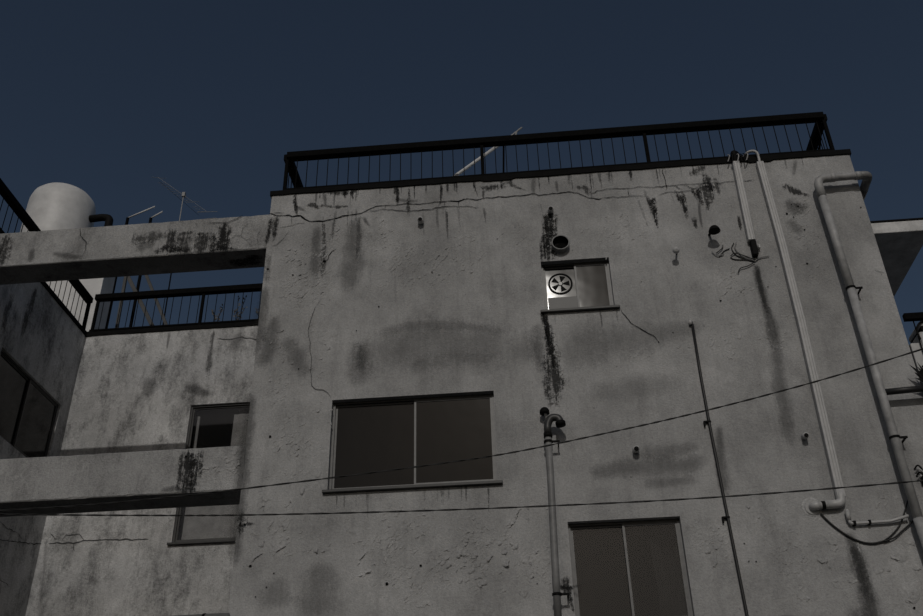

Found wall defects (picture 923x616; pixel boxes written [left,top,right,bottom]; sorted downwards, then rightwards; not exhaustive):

leakage [155,223,262,267]
leakage [293,190,357,213]
crack [216,170,749,246]
leakage [540,213,557,261]
leakage [677,166,720,228]
leakage [541,314,564,405]